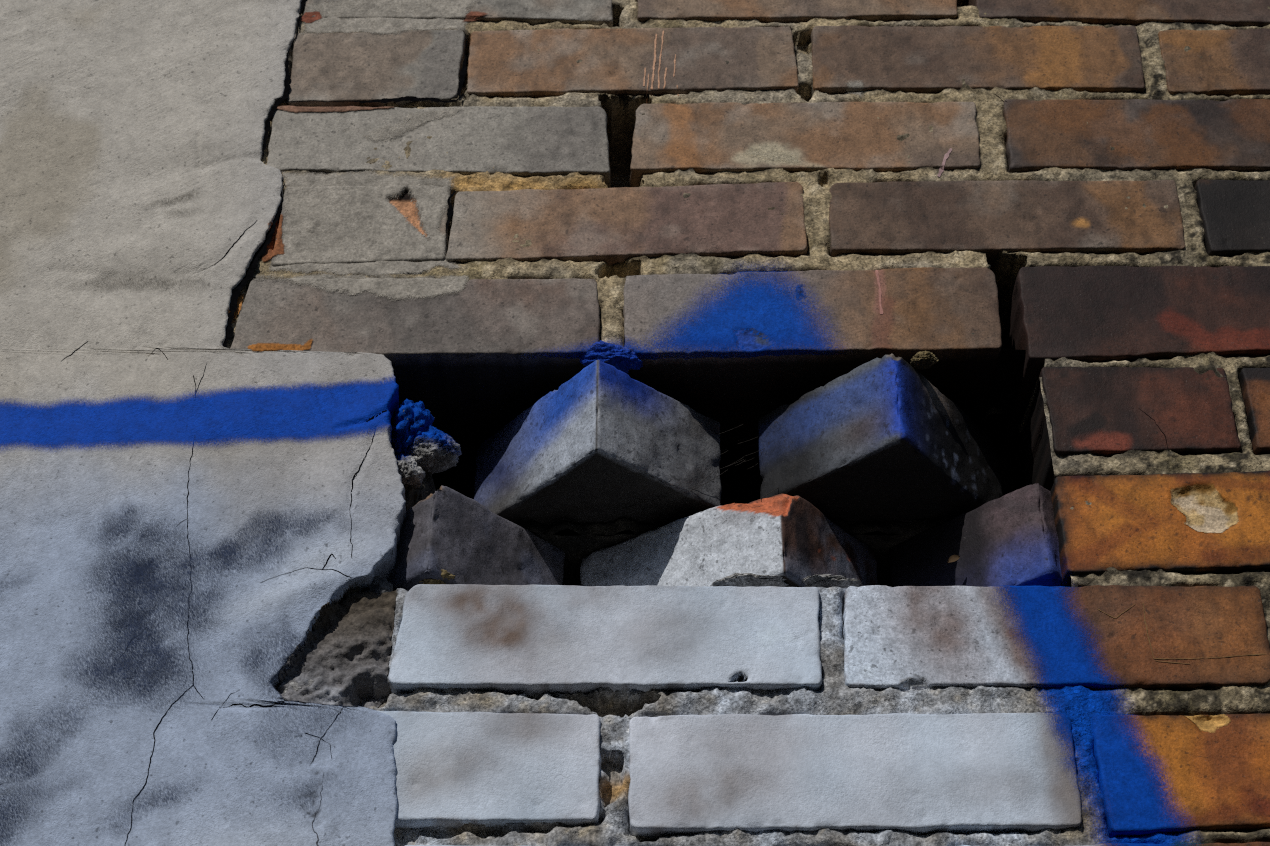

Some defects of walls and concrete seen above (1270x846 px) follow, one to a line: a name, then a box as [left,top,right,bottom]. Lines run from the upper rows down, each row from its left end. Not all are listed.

crack [193,0,469,394]
crack [260,410,393,583]
spalling [1171,484,1239,533]
crack [125,444,284,843]
spalling [273,575,397,708]
crack [304,706,344,846]